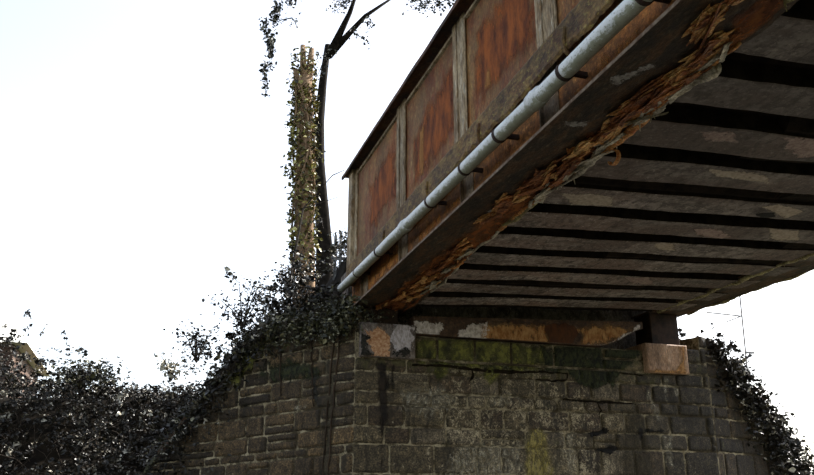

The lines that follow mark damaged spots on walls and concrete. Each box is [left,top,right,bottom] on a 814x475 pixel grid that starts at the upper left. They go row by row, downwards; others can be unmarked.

spalling [473,0,744,225]
peeling [709,169,769,184]
peeling [755,204,803,219]
peeling [768,228,800,241]
peeling [458,321,489,338]
peeling [363,321,444,357]
water stain [376,363,447,436]